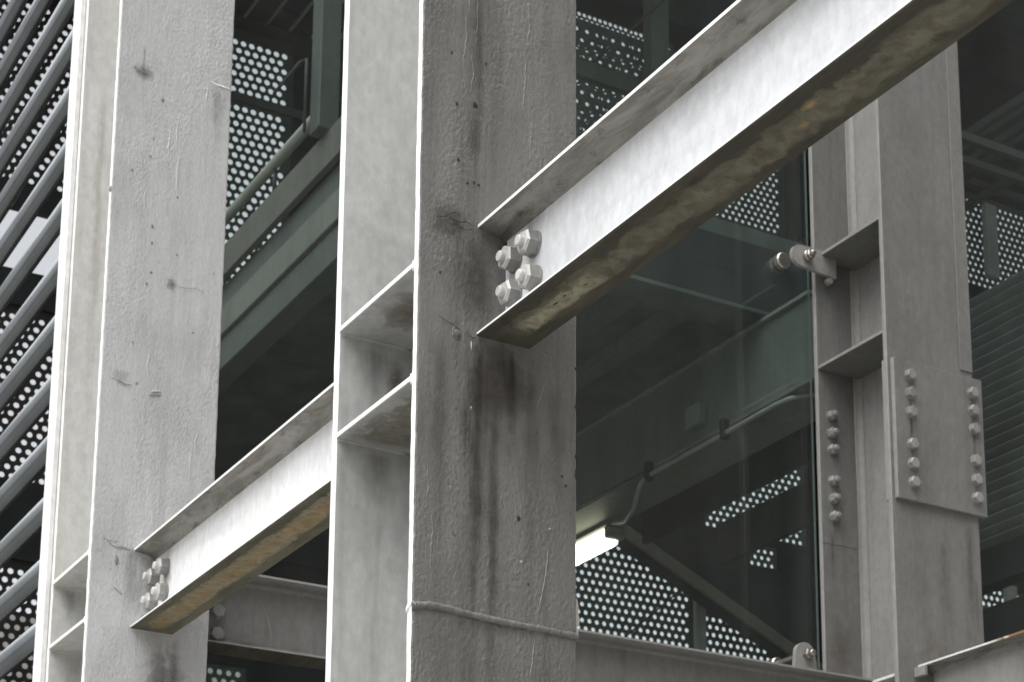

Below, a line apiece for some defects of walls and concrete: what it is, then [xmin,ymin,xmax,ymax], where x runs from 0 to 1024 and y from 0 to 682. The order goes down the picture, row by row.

rust [513,0,988,332]
rust [158,495,331,622]